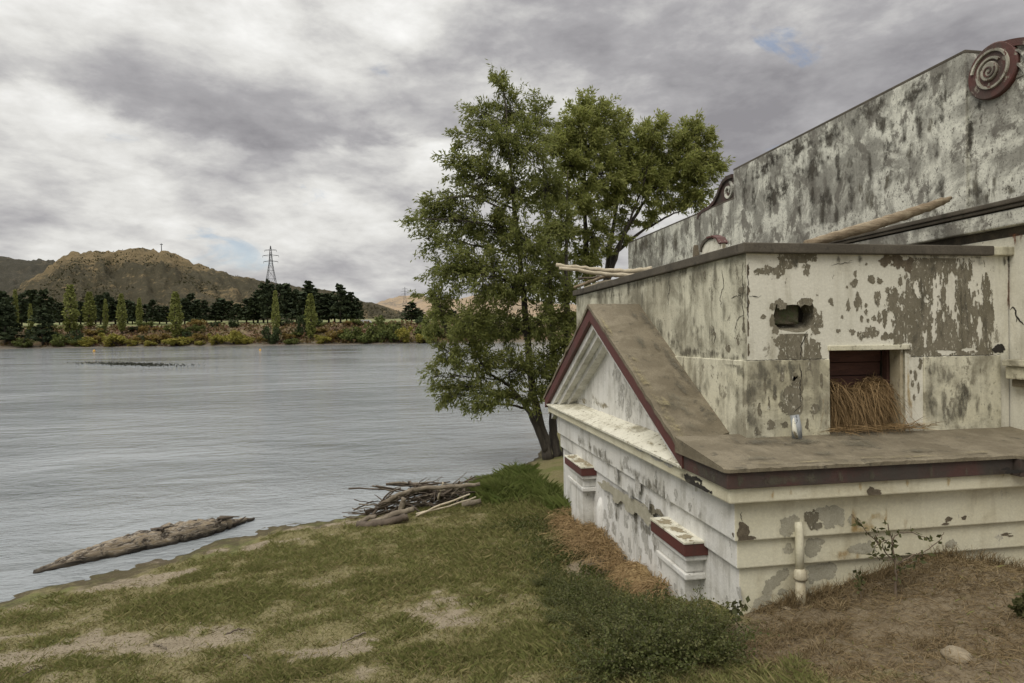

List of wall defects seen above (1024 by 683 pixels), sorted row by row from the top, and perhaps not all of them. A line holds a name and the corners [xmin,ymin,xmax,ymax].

water stain [852,84,946,156]
water stain [743,132,902,225]
water stain [968,172,995,203]
water stain [635,231,678,253]
peeling [725,254,1005,436]
water stain [930,367,990,420]
spalling [684,473,712,494]
spalling [732,522,756,541]
peeling [779,505,862,584]